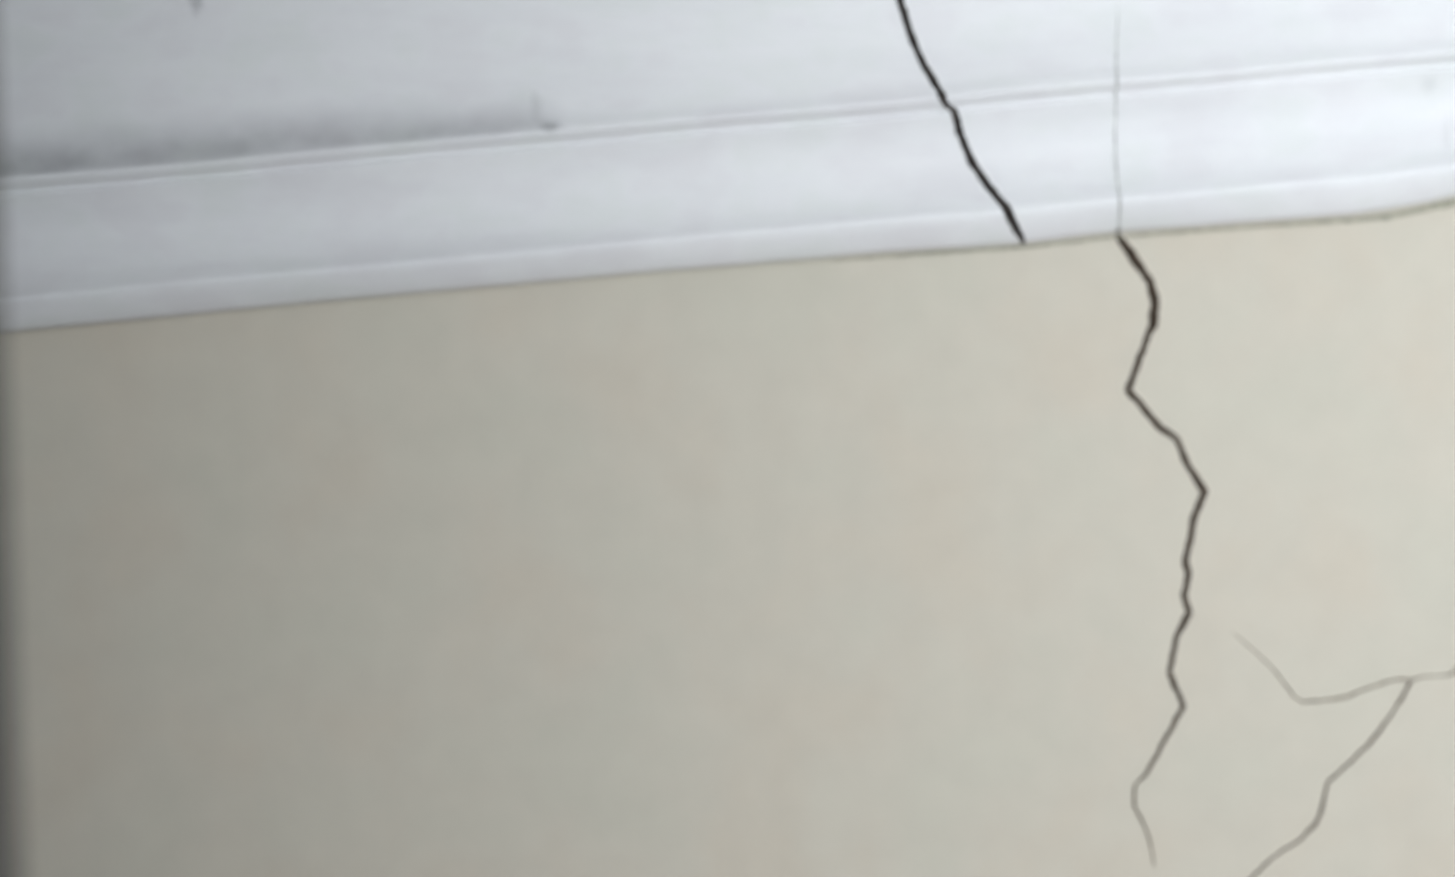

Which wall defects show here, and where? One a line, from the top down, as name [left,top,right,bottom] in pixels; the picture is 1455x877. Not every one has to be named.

crack [894,0,1027,244]
crack [1112,2,1212,867]
crack [1232,632,1455,877]